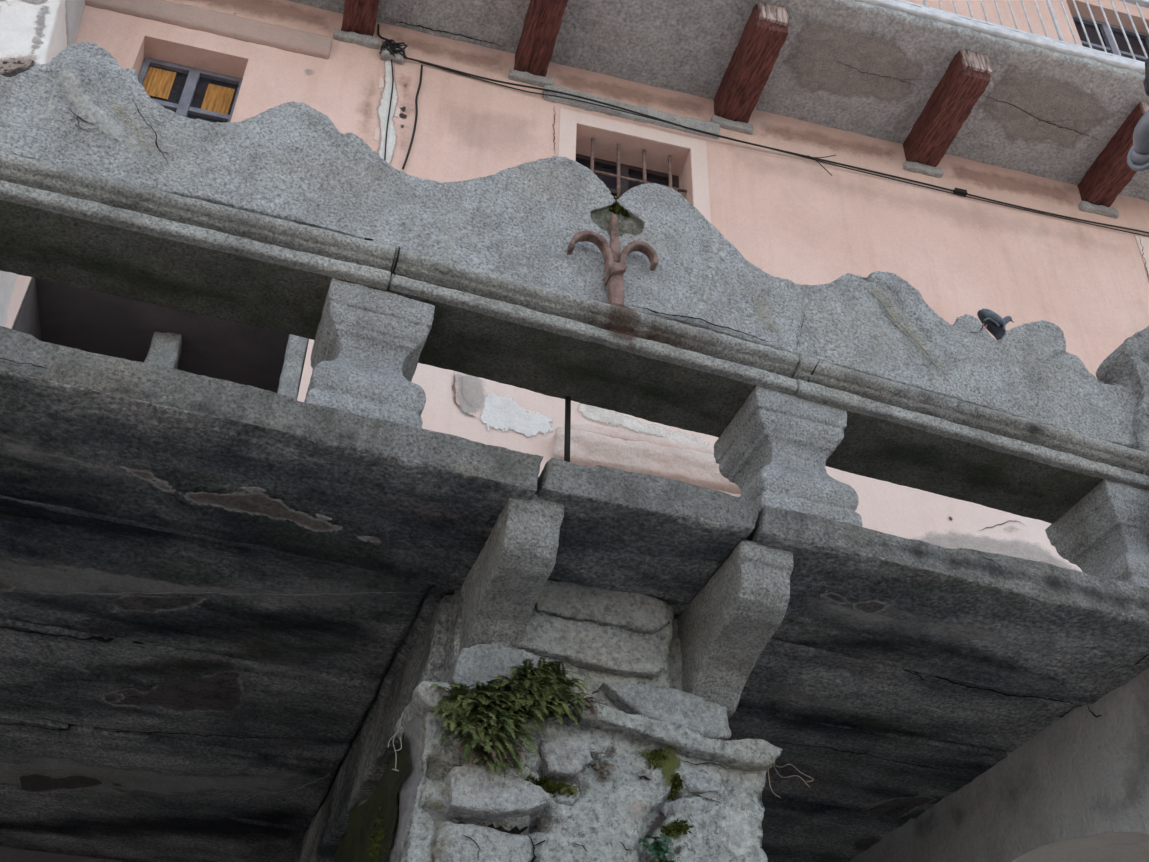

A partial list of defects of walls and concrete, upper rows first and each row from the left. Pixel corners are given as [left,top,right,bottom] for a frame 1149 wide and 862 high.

peeling [6,0,50,54]
peeling [373,59,401,165]
crack [983,95,1101,141]
corrosion [603,305,639,345]
peeling [458,376,554,437]
peeling [119,466,343,532]
peeling [355,535,383,545]
peeling [108,594,207,614]
crack [903,669,1102,718]
spalling [17,773,128,792]